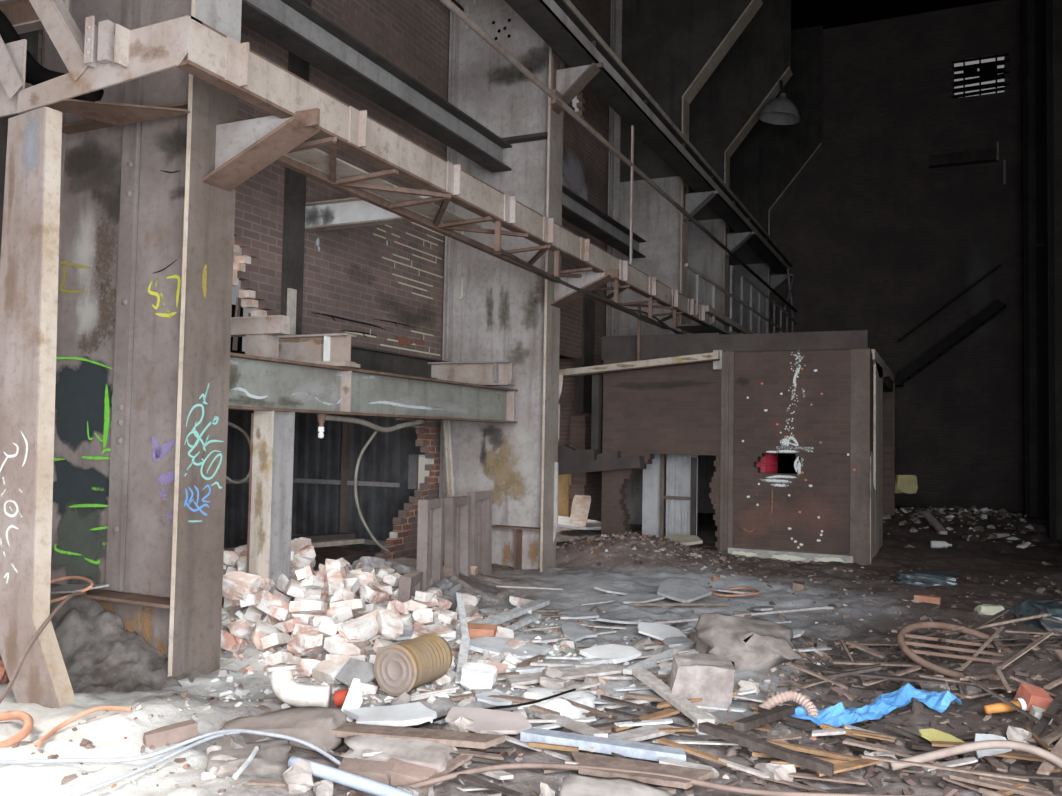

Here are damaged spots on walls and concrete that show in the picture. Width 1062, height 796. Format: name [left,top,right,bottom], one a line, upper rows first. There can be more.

crack [311,312,416,337]
leakage [480,427,502,463]